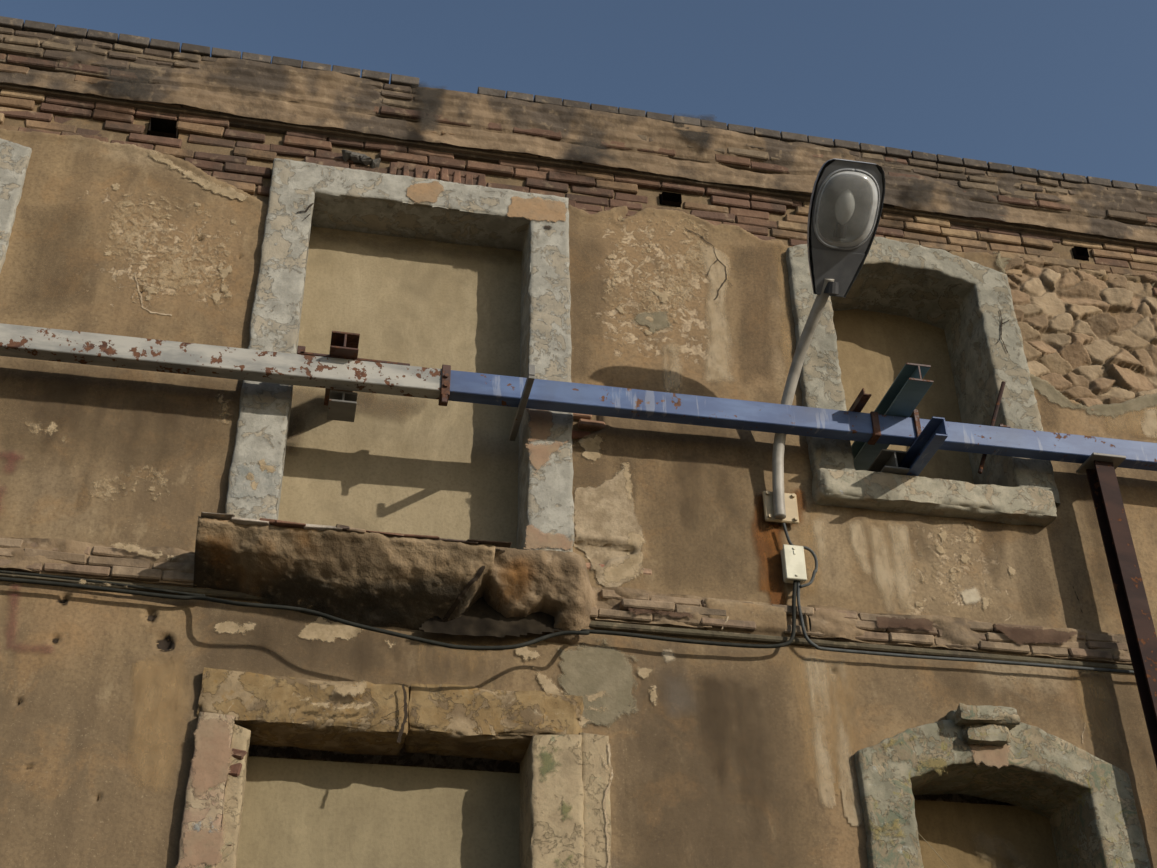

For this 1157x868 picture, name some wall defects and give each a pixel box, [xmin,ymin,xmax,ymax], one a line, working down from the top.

flaking render [0,89,810,335]
crack [685,228,730,300]
flaking render [875,212,1157,411]
peeling [526,409,606,475]
flaking render [524,462,756,631]
corrosion [754,496,786,605]
corrosion [795,490,804,521]
flaking render [214,621,257,634]
flaking render [298,617,364,642]
water stain [795,656,861,826]